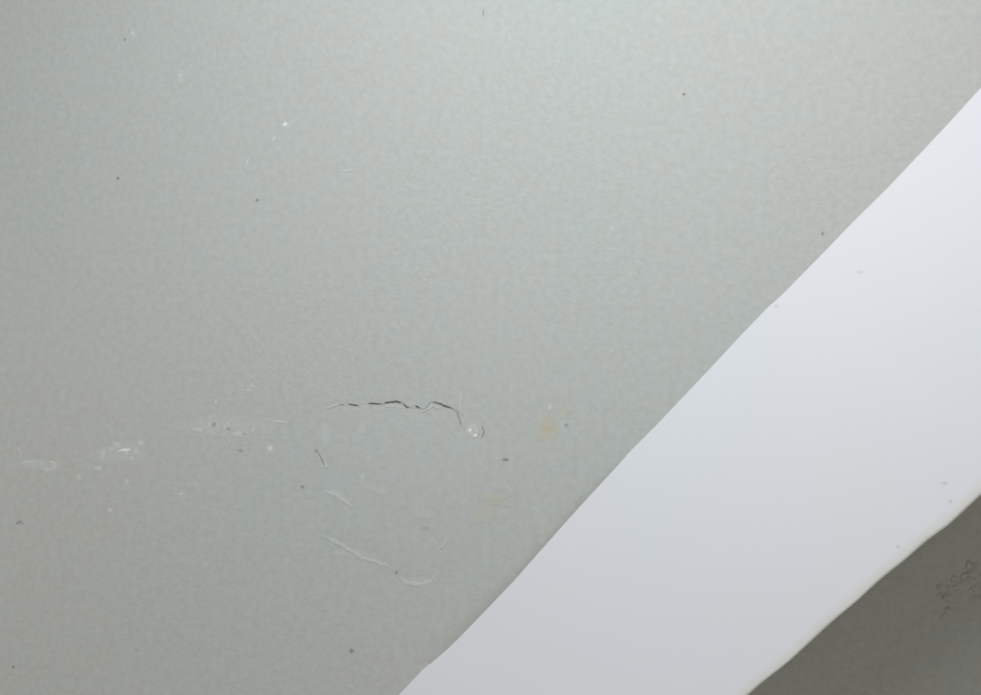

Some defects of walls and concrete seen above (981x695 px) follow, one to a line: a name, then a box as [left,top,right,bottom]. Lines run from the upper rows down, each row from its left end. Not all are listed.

crack [325,388,463,432]